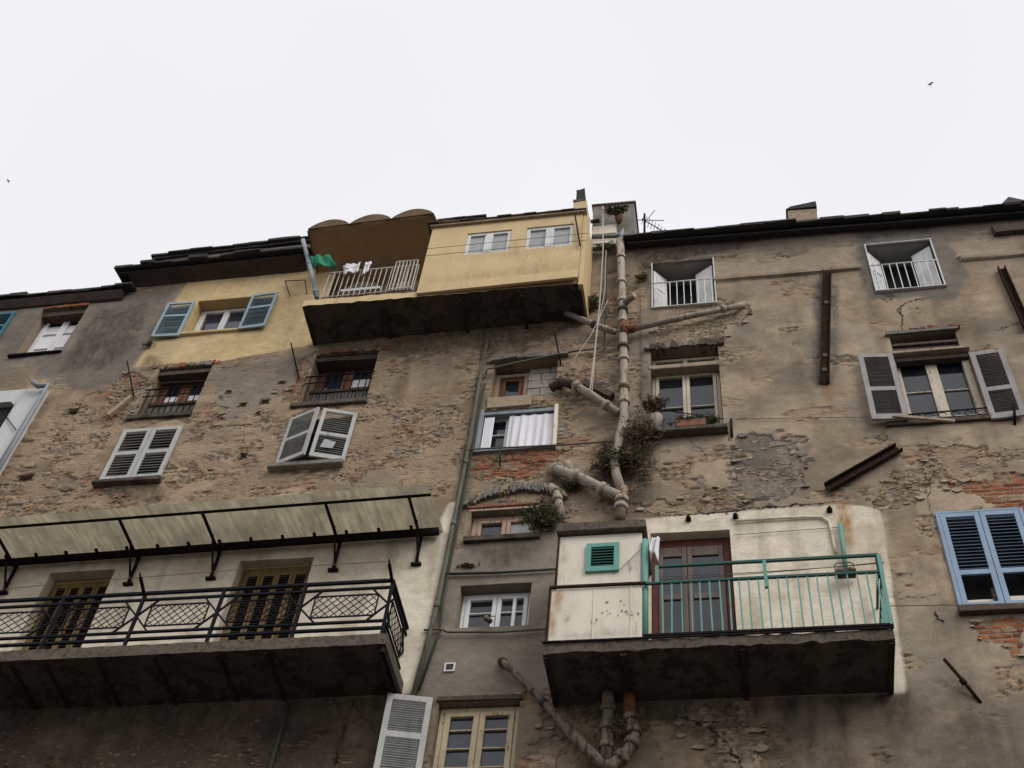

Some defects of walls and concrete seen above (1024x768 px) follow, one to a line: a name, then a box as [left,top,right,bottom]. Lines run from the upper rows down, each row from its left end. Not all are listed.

flaking render [63,371,148,428]
flaking render [185,357,312,443]
spalling [12,474,38,482]
spalling [61,471,126,501]
flaking render [462,442,571,481]
spalling [633,433,816,516]
spalling [865,446,1024,512]
flaking render [970,616,1024,658]